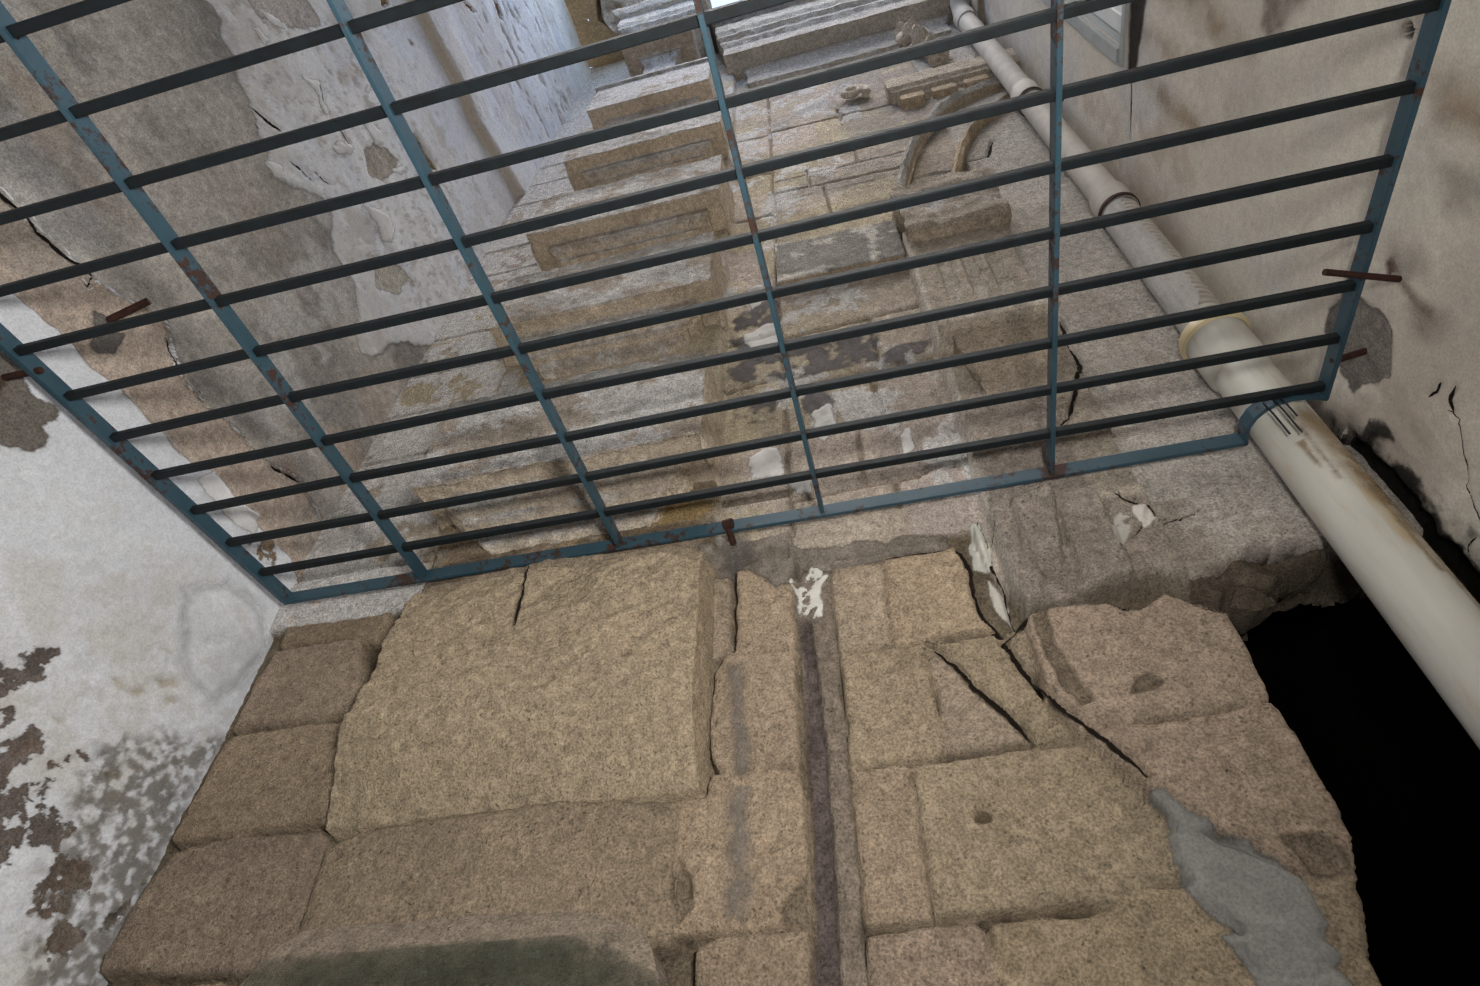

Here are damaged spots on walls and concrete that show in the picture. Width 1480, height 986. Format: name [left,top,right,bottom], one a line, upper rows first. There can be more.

flaking render [248,0,320,45]
peeling [264,160,285,179]
flaking render [332,122,407,181]
flaking render [375,265,412,294]
flaking render [0,198,321,574]
crack [1429,382,1480,556]
crack [885,522,1148,778]
peeling [0,647,131,962]